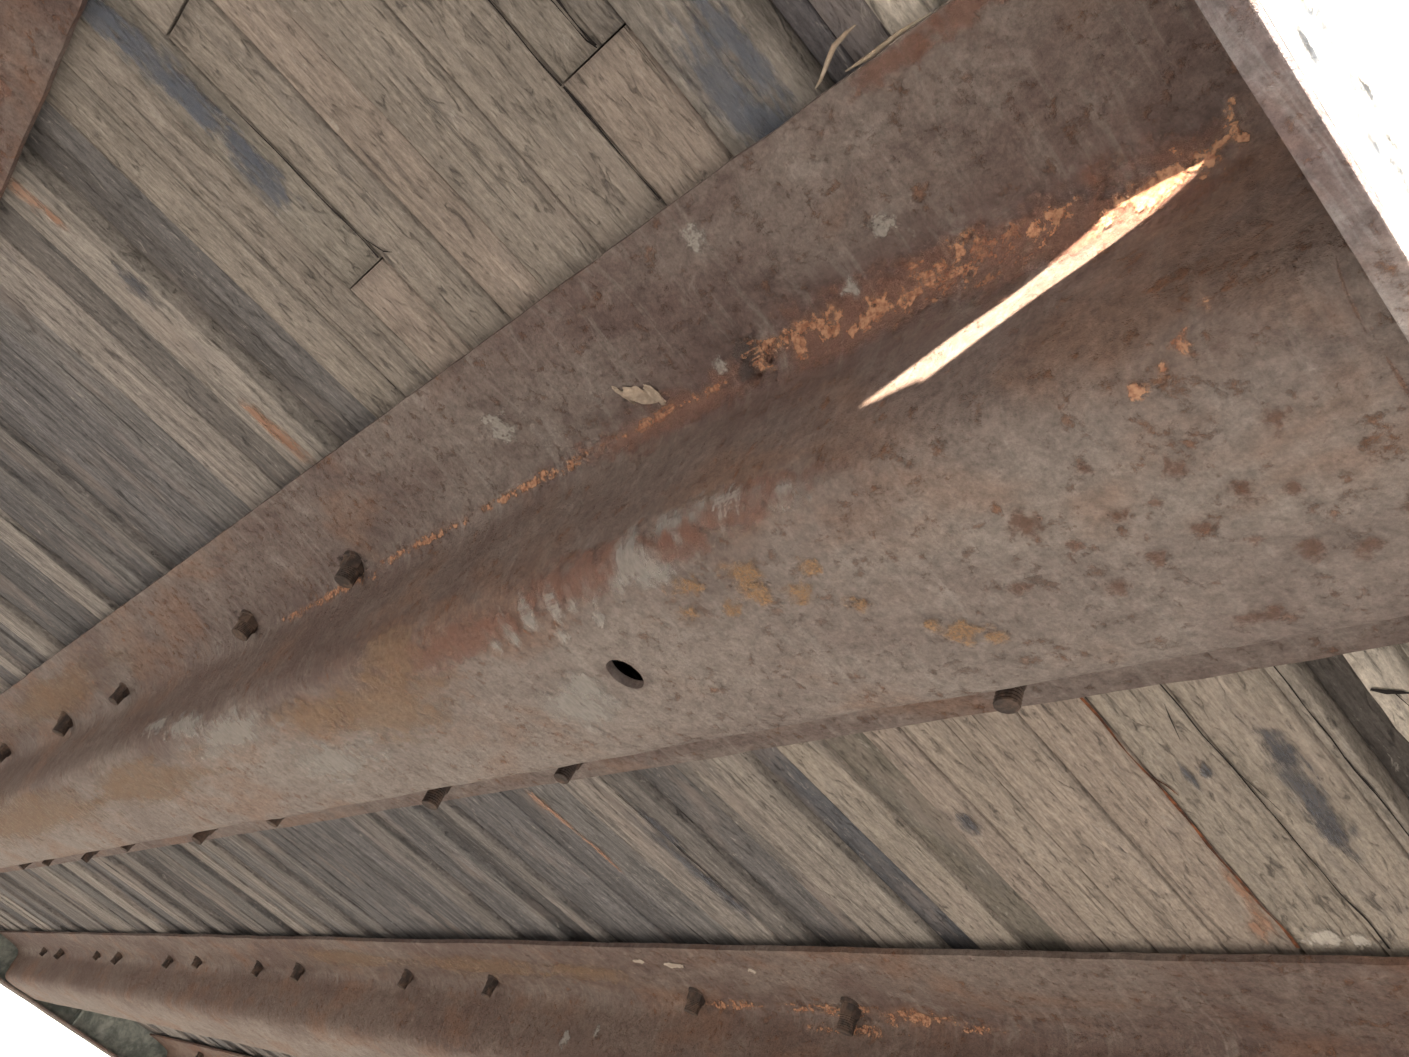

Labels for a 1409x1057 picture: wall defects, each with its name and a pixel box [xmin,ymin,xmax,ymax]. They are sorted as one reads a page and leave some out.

rust [1096,97,1250,233]
rust [741,196,1077,371]
rust [481,381,728,512]
rust [1127,383,1149,401]
rust [282,520,467,622]
rust [786,1002,1009,1038]